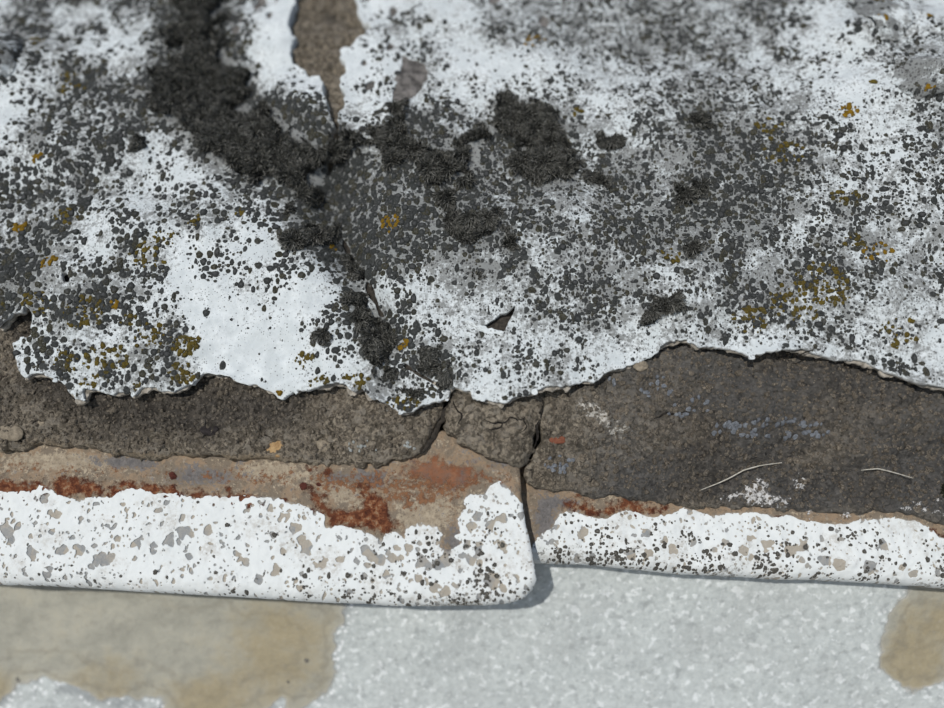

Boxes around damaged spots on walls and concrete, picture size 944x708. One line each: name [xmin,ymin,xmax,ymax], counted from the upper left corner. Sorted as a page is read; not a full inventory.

spalling [291,0,366,136]
crack [362,276,384,317]
spalling [0,311,449,469]
crack [403,363,434,383]
crack [453,400,544,448]
spalling [523,339,944,525]
rust [0,456,517,535]
damp [0,585,345,708]
damp [880,586,944,691]